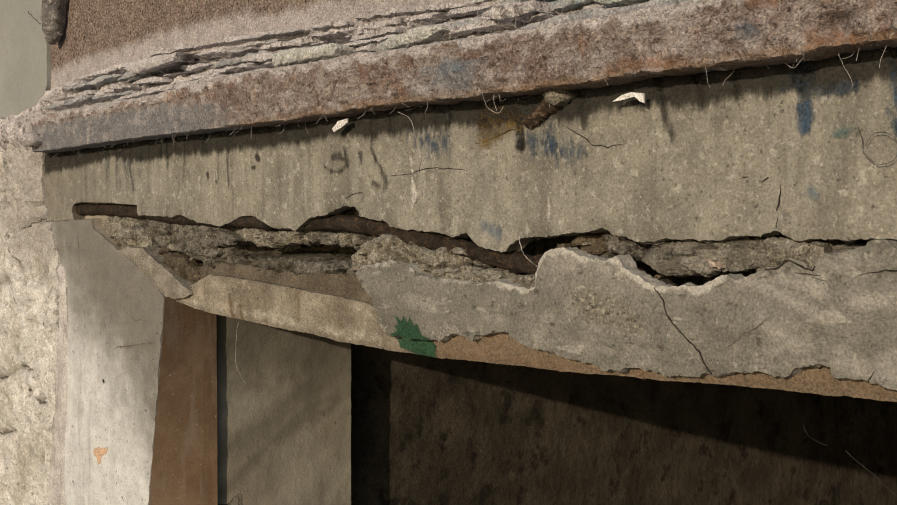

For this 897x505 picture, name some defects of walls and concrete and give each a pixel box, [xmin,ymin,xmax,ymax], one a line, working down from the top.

water stain [44,94,544,173]
peeling [332,118,348,132]
corrosion [30,0,897,153]
peeling [612,92,645,103]
water stain [544,47,897,140]
spalling [75,203,544,309]
spalling [557,232,867,279]
peeling [243,310,381,342]
crack [654,287,712,374]